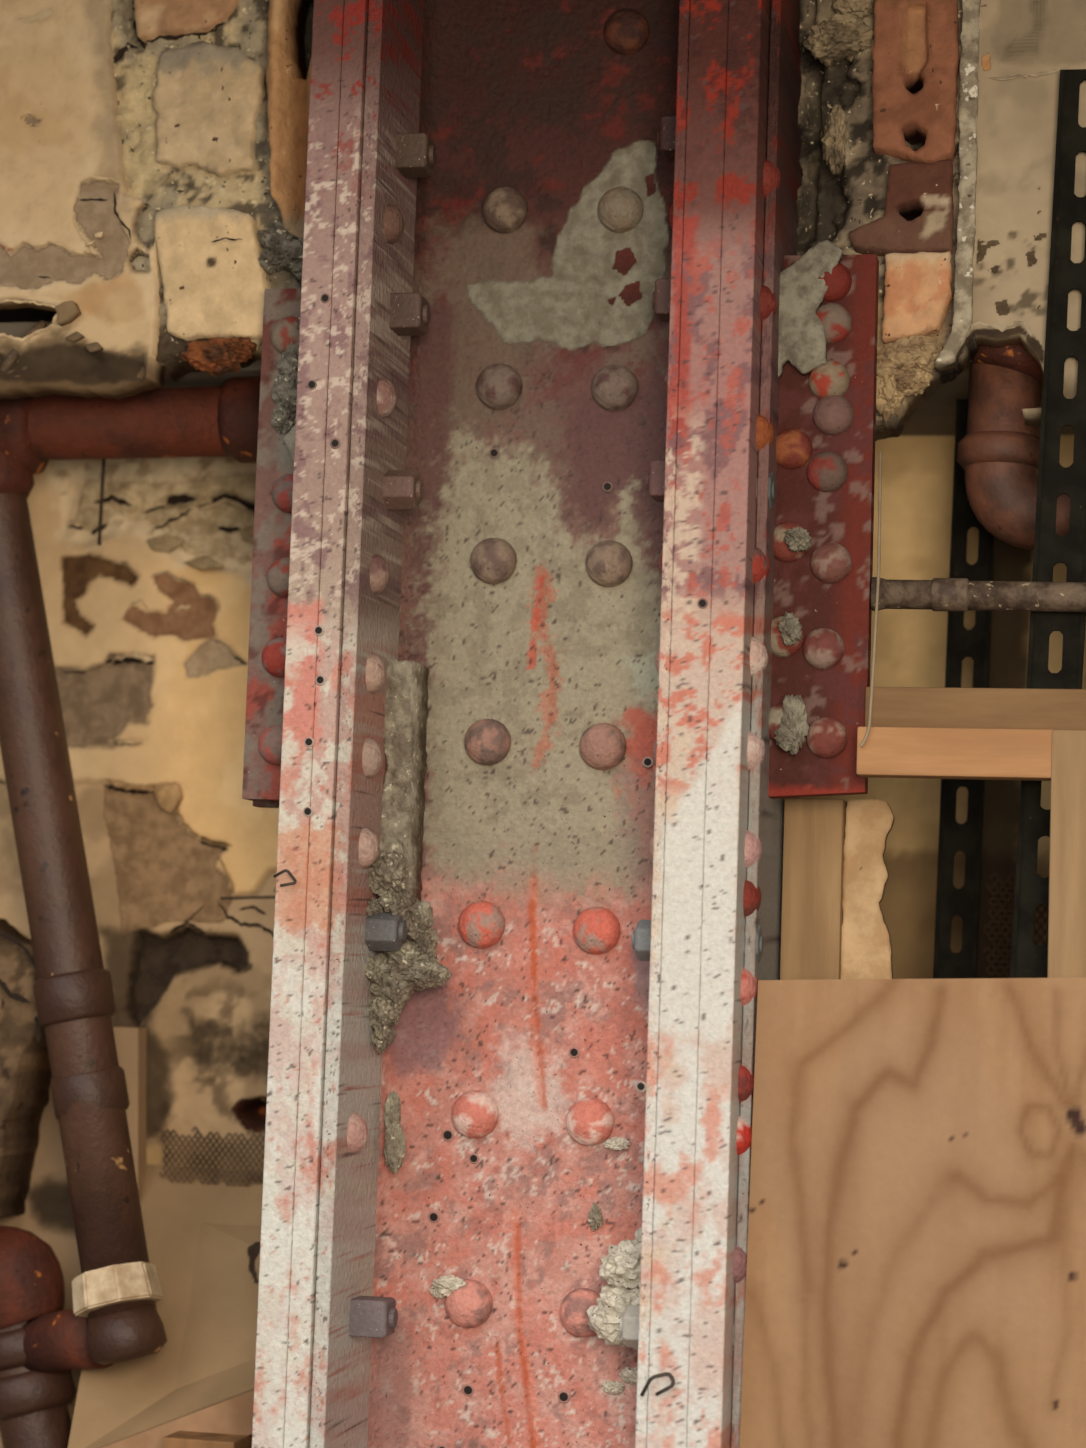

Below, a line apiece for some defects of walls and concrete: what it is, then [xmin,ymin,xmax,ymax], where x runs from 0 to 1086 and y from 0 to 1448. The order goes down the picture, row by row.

flaking render [0,176,149,289]
peeling [466,140,669,350]
spalling [0,301,144,384]
crack [67,494,255,535]
spalling [63,474,256,677]
flaking render [55,651,155,747]
crack [184,902,274,937]